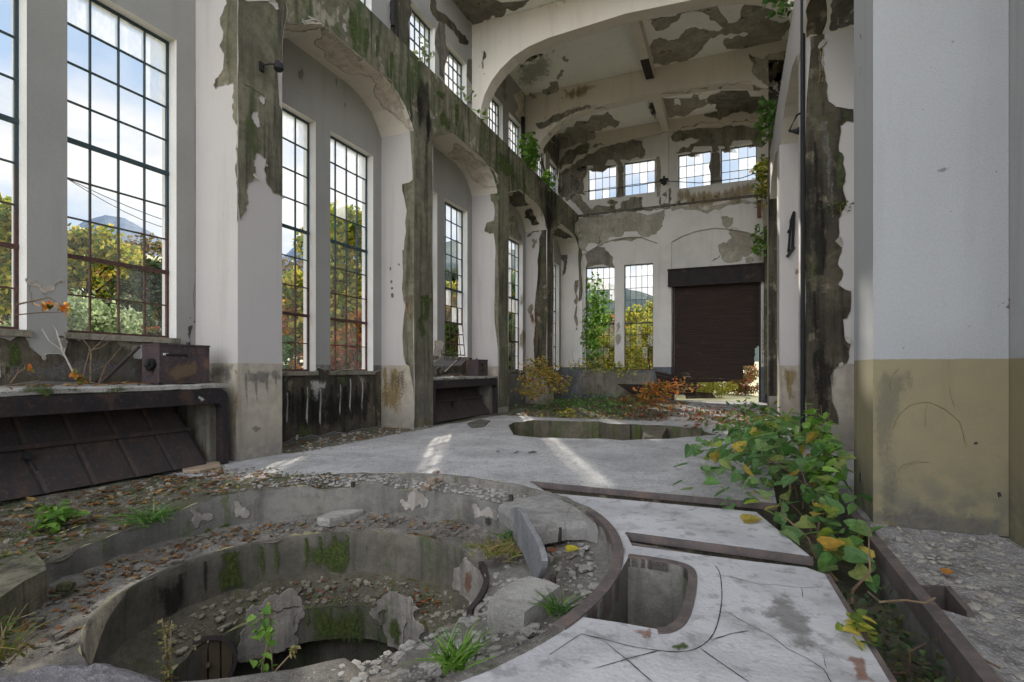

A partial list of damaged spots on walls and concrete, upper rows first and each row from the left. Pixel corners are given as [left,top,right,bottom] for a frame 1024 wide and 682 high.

water stain [286,379,370,428]
peeling [213,0,472,427]
peeling [484,4,790,408]
peeling [805,0,854,425]
crack [549,567,831,682]